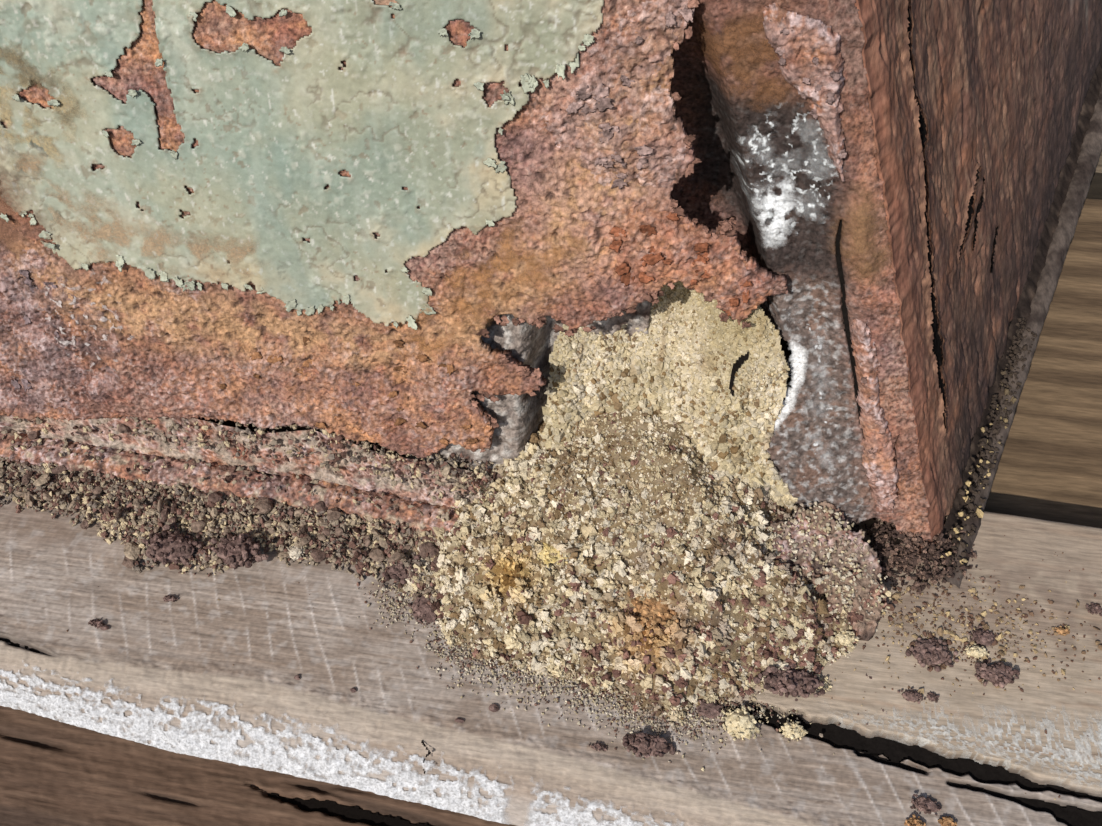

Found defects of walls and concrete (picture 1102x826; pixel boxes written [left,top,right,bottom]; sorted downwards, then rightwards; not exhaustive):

peeling [0,210,56,250]
peeling [92,0,185,160]
peeling [188,0,312,66]
peeling [438,19,481,47]
peeling [474,34,595,106]
rust [453,225,675,338]
rust [566,82,653,189]
rust [665,0,700,51]
rust [666,199,753,323]
water stain [737,118,834,244]
crack [835,219,864,435]
crack [899,0,999,440]